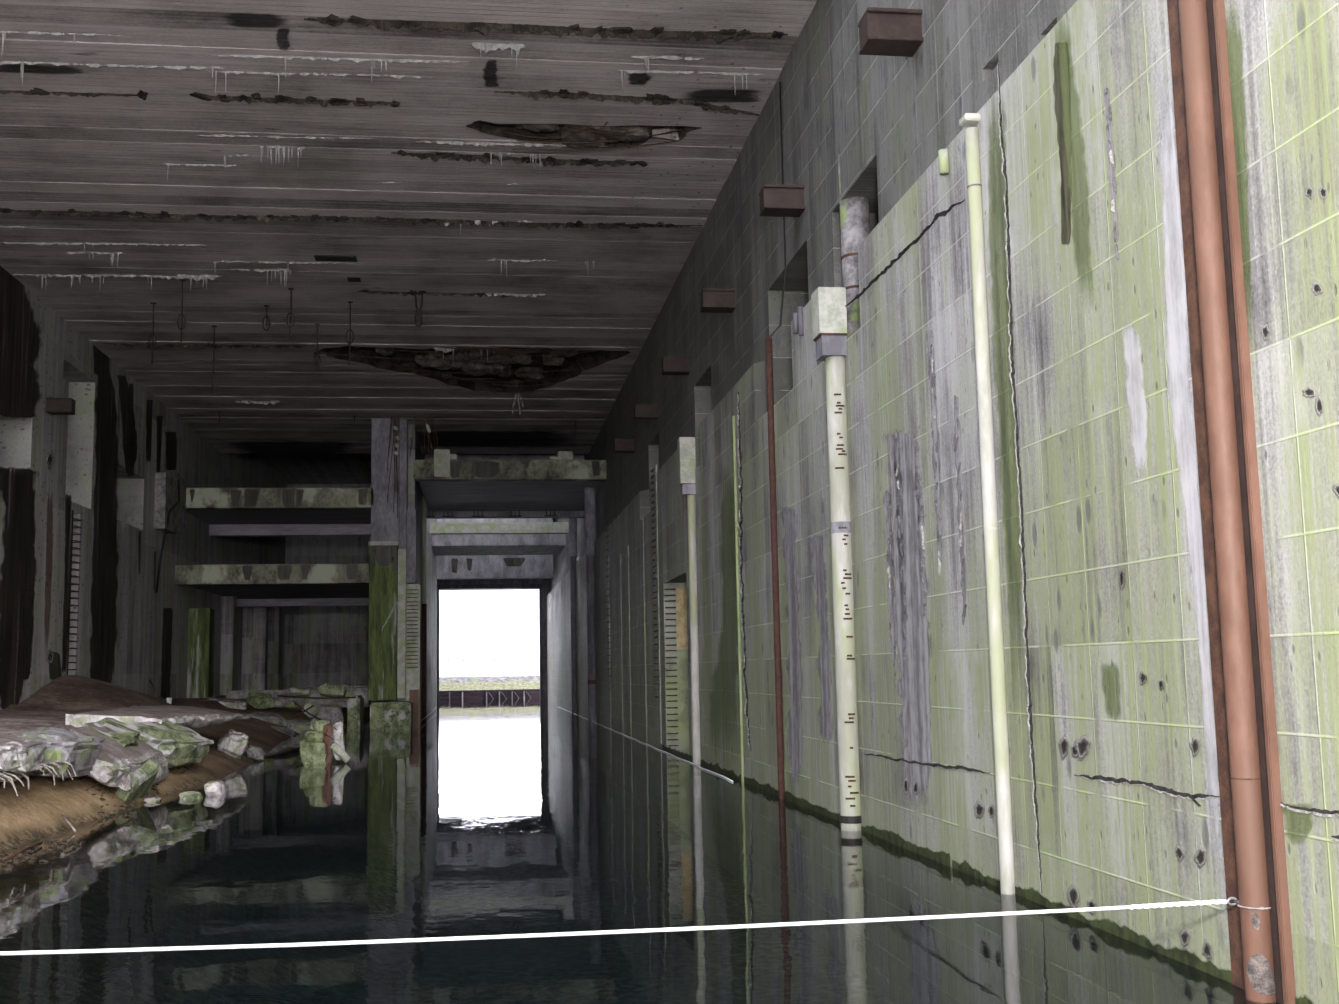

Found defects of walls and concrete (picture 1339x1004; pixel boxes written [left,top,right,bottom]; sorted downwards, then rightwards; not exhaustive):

leakage [0,225,353,418]
spalling [103,342,630,393]
spalling [391,120,702,167]
spalling [494,89,759,116]
crack [845,199,965,307]
leakage [1227,31,1250,288]
leakage [0,467,36,709]
leakage [90,345,177,683]
peeling [883,329,967,802]
crack [997,64,1042,894]
crack [1074,774,1220,806]
crack [1280,802,1339,842]